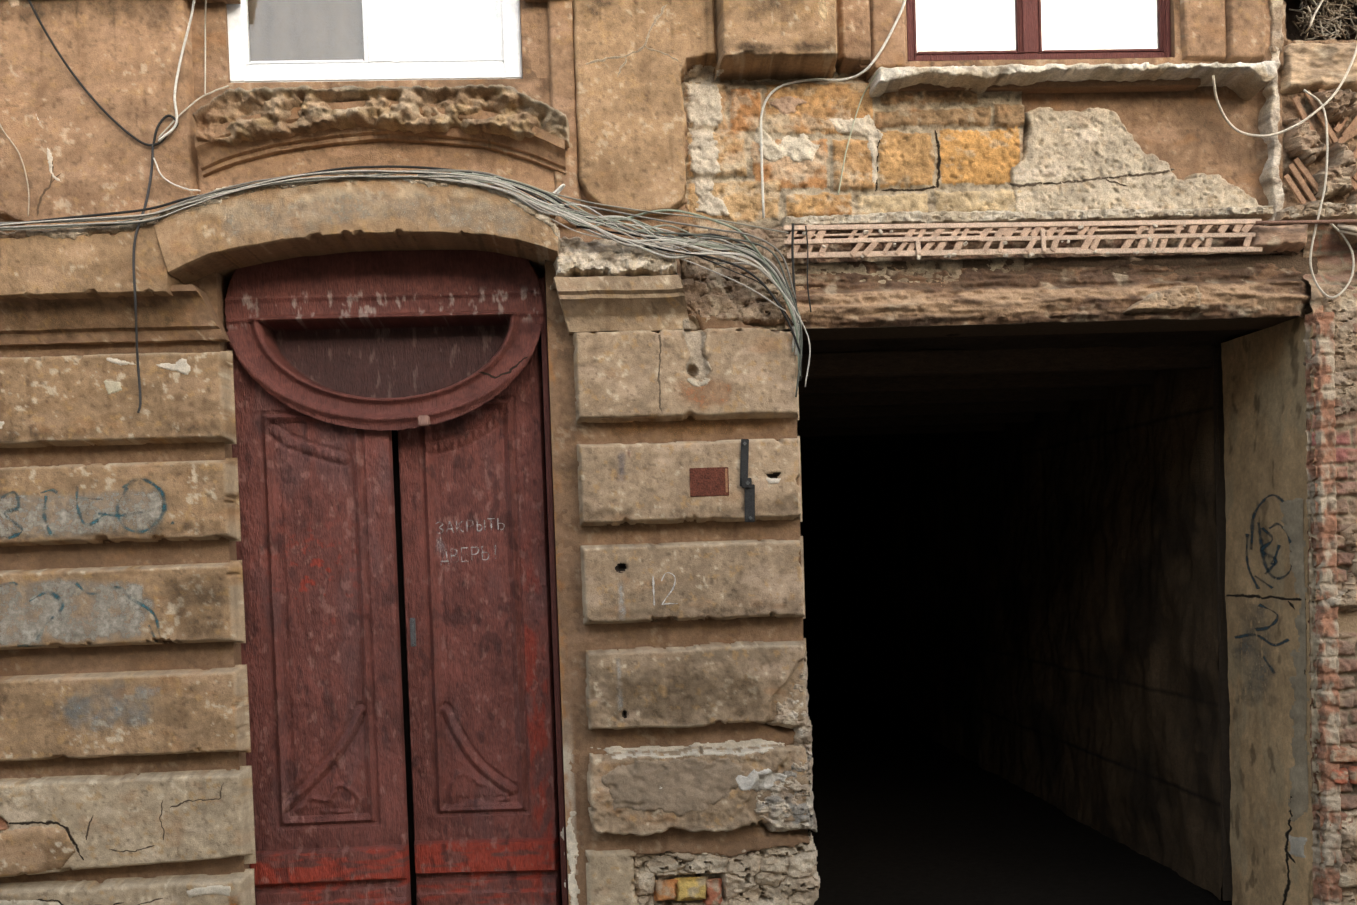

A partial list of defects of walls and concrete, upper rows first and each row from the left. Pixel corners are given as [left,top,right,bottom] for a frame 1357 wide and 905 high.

flaking render [681,64,1270,234]
flaking render [1280,0,1357,208]
flaking render [794,258,1024,291]
flaking render [750,322,789,330]
flaking render [1280,498,1357,858]
crack [7,783,224,860]
crack [99,897,163,905]
flaking render [560,811,580,905]
flaking render [590,651,820,905]
spalling [1338,809,1357,905]